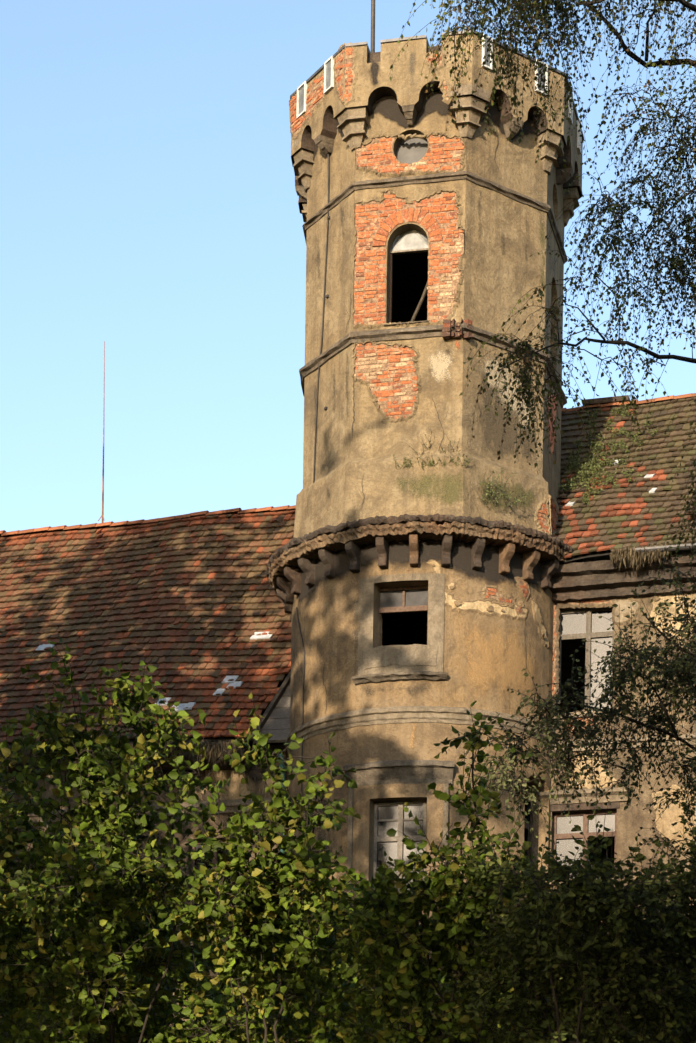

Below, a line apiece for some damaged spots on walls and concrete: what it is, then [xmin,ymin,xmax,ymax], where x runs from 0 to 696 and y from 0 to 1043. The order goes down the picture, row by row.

spalling [289,42,358,141]
spalling [352,132,473,424]
peeling [425,560,696,697]